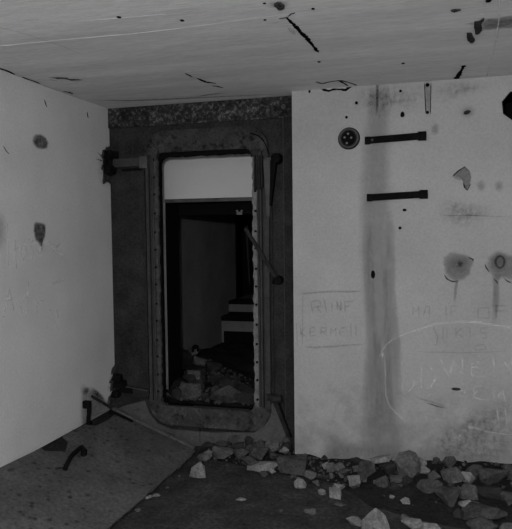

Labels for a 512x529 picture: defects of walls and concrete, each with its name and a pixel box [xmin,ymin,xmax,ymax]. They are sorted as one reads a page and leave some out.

crack [276,13,319,52]
spalling [467,18,484,43]
crack [453,65,466,79]
crack [185,73,223,96]
damp [34,135,47,148]
peeling [453,166,471,190]